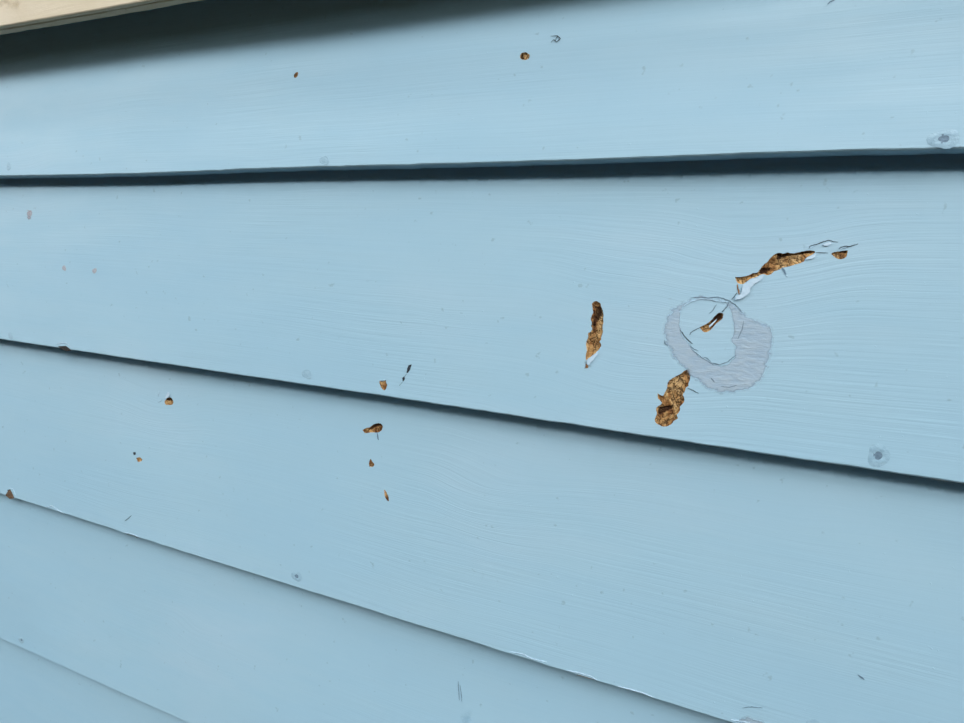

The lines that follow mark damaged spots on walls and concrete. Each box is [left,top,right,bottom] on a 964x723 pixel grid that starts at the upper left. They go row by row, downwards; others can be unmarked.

spalling [681,250,848,334]
spalling [585,301,604,368]
peeling [363,423,383,440]
spalling [655,369,698,427]